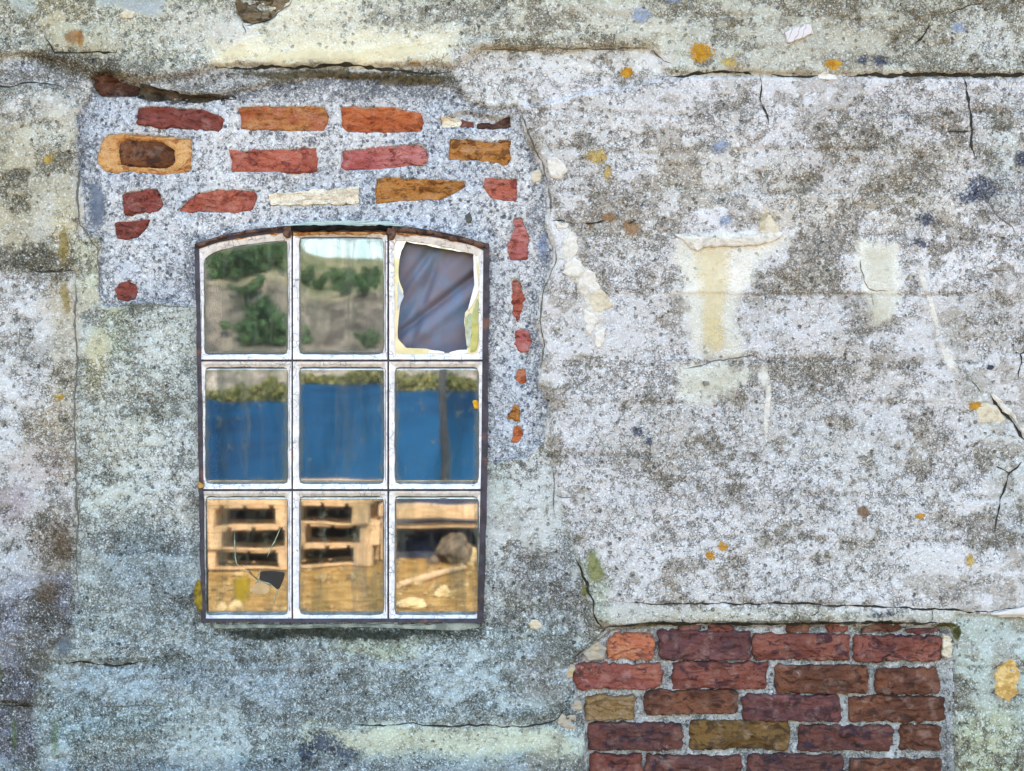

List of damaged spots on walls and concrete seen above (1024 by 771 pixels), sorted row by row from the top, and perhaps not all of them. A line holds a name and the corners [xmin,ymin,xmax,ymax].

crack [520,109,636,225]
crack [489,47,818,122]
crack [843,72,1024,159]
spalling [76,74,613,463]
crack [538,249,557,372]
crack [972,382,1024,533]
crack [575,558,1017,629]